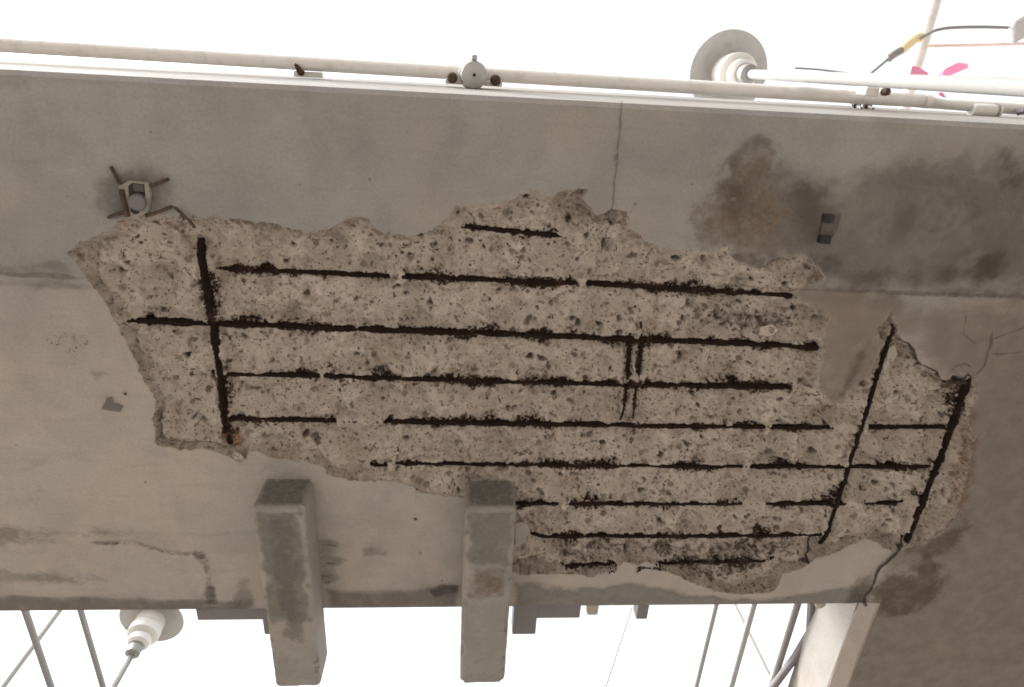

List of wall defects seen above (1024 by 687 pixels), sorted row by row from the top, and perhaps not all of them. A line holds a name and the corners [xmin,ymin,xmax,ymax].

corrosion [693,300,796,329]
spalling [67,188,977,595]
corrosion [942,375,967,391]
corrosion [560,538,619,561]
corrosion [636,537,793,579]
crack [863,534,903,607]